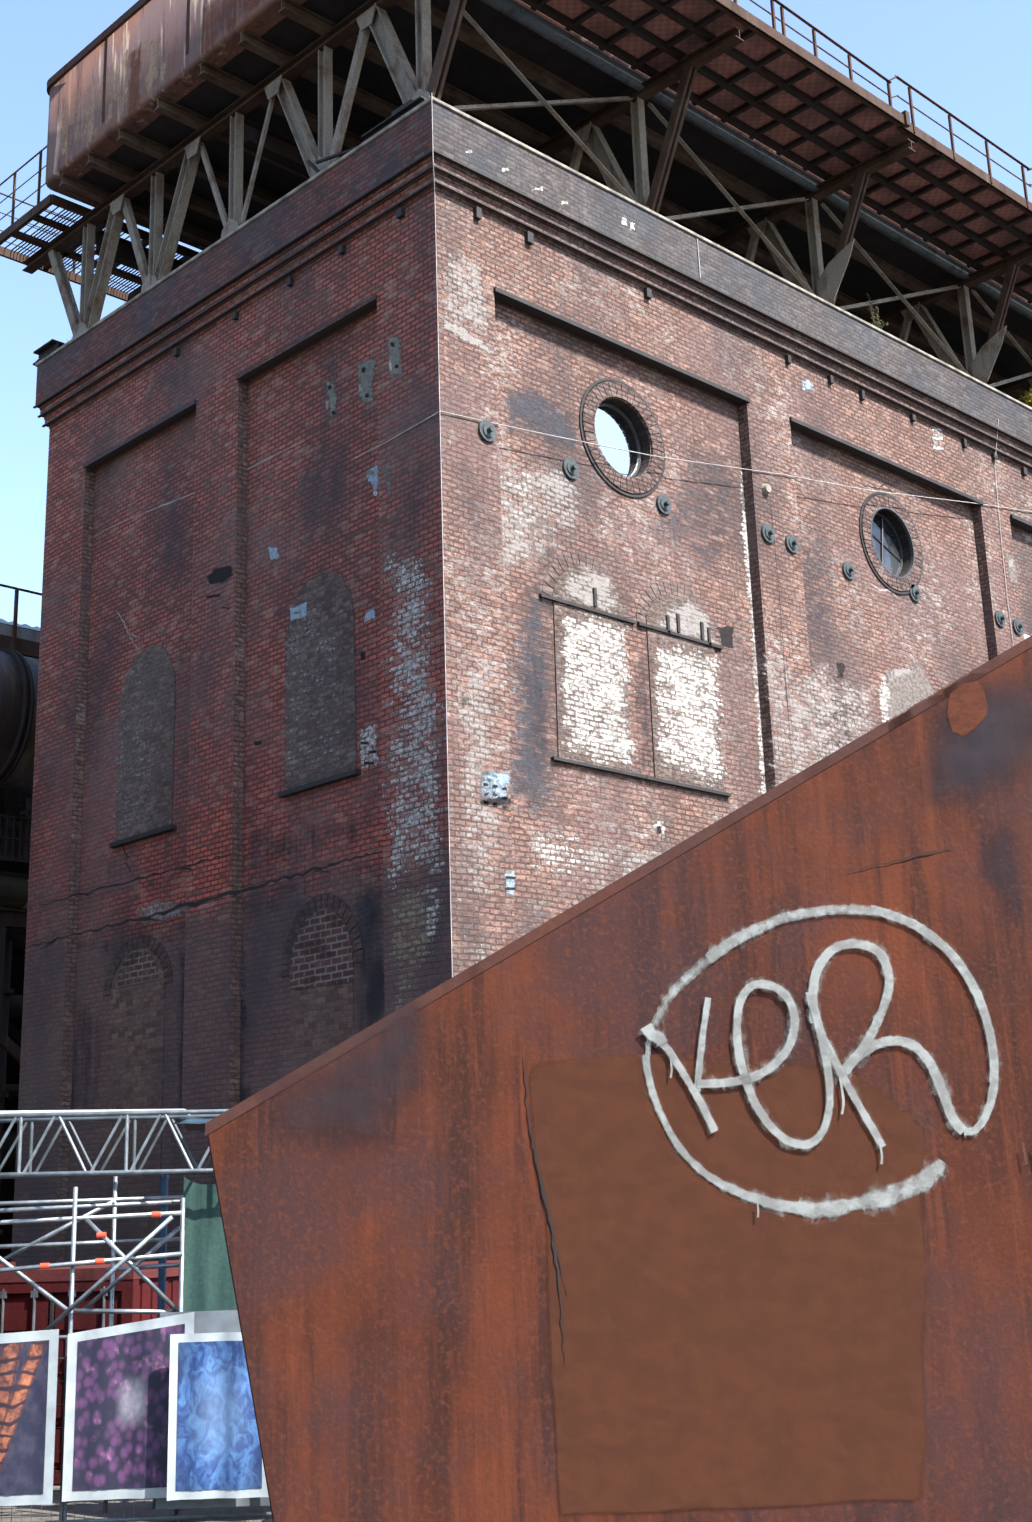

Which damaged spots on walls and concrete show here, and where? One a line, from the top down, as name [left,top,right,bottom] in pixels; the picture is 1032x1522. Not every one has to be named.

corrosion [201,0,259,52]
corrosion [947,681,987,737]
water stain [317,545,507,1120]
crack [28,846,382,949]
corrosion [530,1054,926,1514]